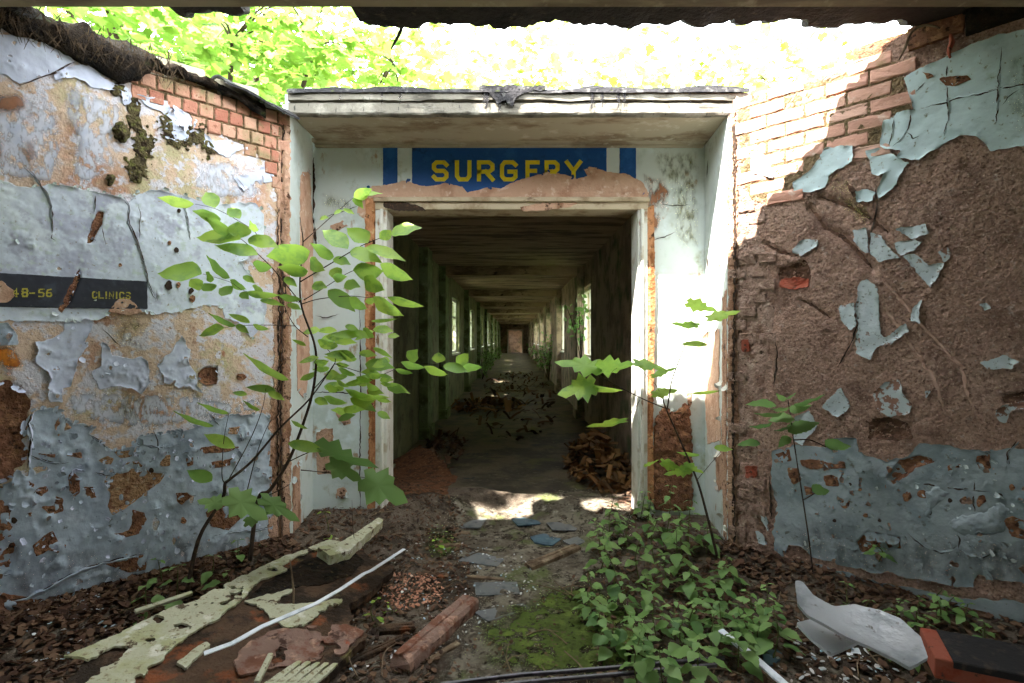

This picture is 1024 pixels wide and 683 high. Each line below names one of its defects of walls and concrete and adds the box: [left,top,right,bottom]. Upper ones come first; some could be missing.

crack [889,48,1024,146]
water stain [649,178,668,229]
crack [869,184,878,251]
peeling [0,34,315,662]
peeling [702,29,1024,623]
spalling [652,385,697,512]